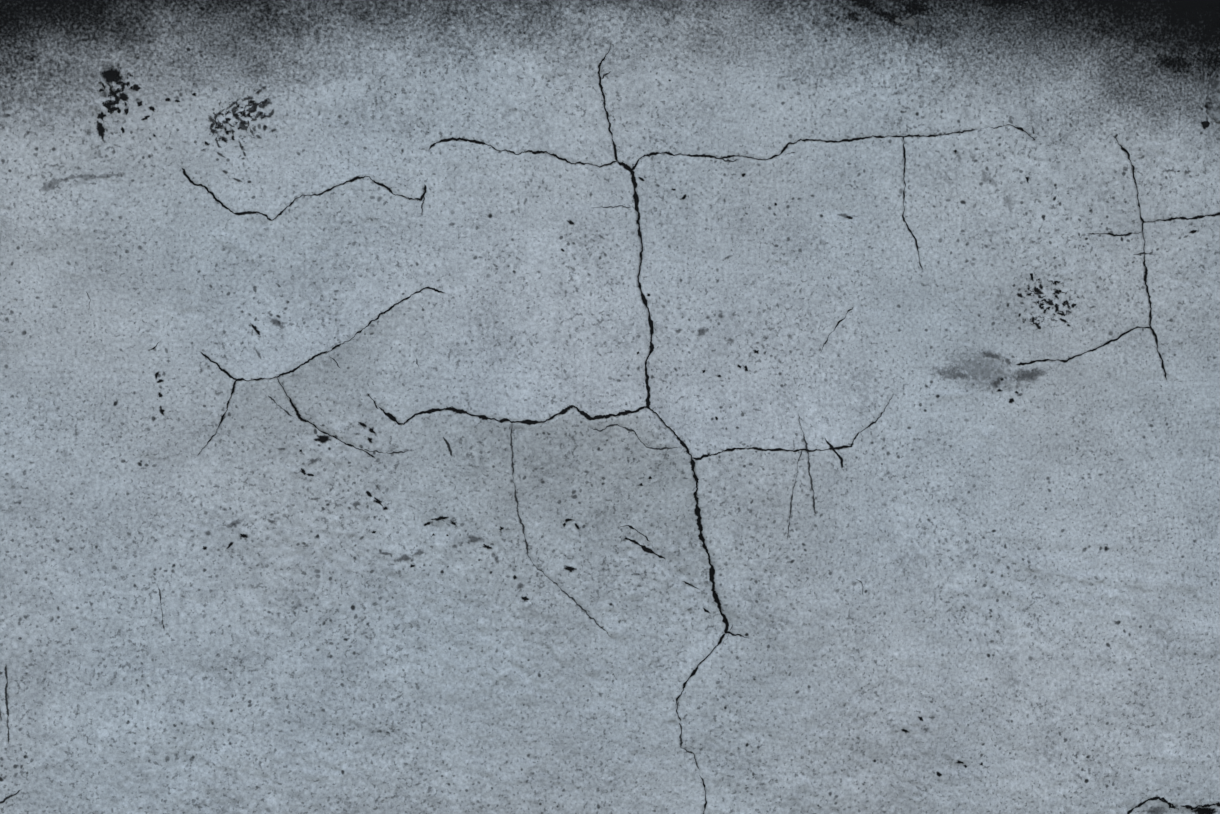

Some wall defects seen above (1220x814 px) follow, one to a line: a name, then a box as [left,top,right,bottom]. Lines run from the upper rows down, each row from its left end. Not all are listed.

peeling [1201,67,1220,129]
crack [1016,136,1220,380]
crack [182,43,1035,814]